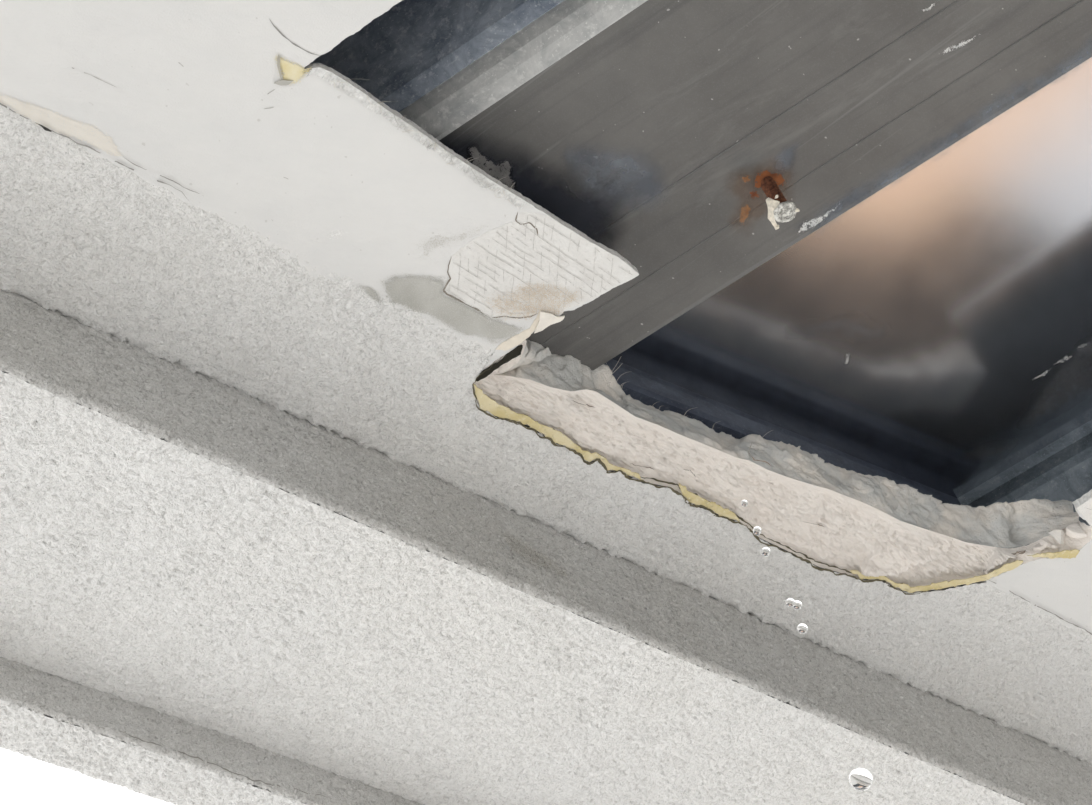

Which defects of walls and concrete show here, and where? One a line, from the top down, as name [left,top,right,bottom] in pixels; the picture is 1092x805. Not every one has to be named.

rust [739,170,786,224]
spalling [443,212,1092,595]